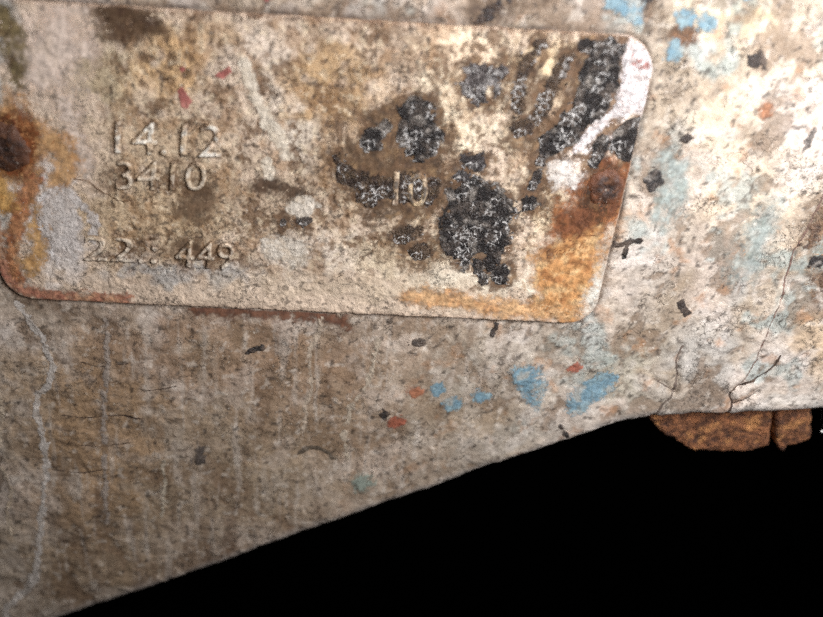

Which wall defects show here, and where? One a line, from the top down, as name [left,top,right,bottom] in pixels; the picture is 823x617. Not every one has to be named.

rust [0,93,134,303]
rust [401,156,631,323]
crack [654,345,684,414]
crack [727,178,823,413]